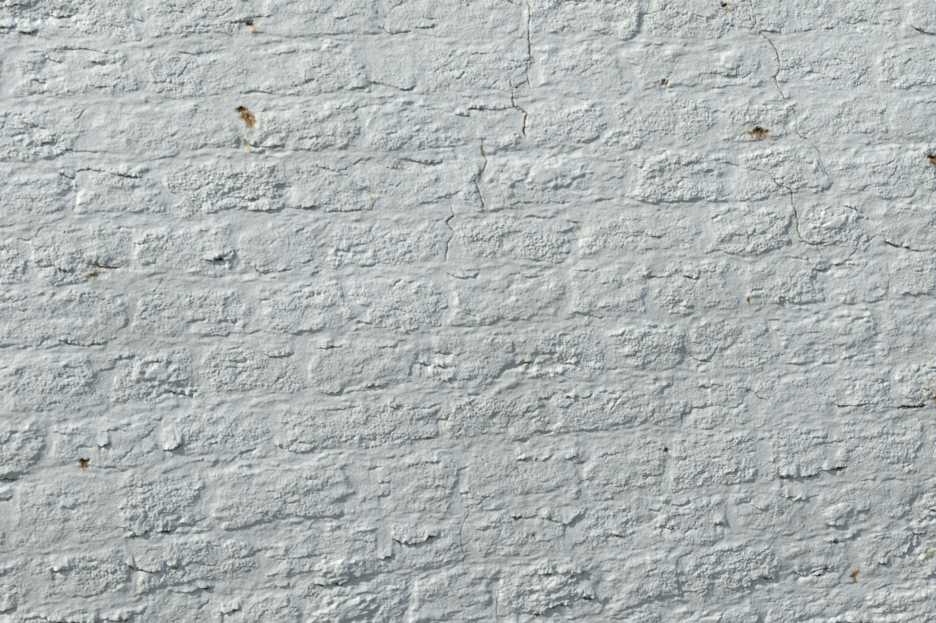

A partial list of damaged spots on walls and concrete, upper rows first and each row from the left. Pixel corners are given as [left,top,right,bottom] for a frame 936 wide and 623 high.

corrosion [237,107,256,126]
crack [510,78,529,136]
crack [752,169,840,247]